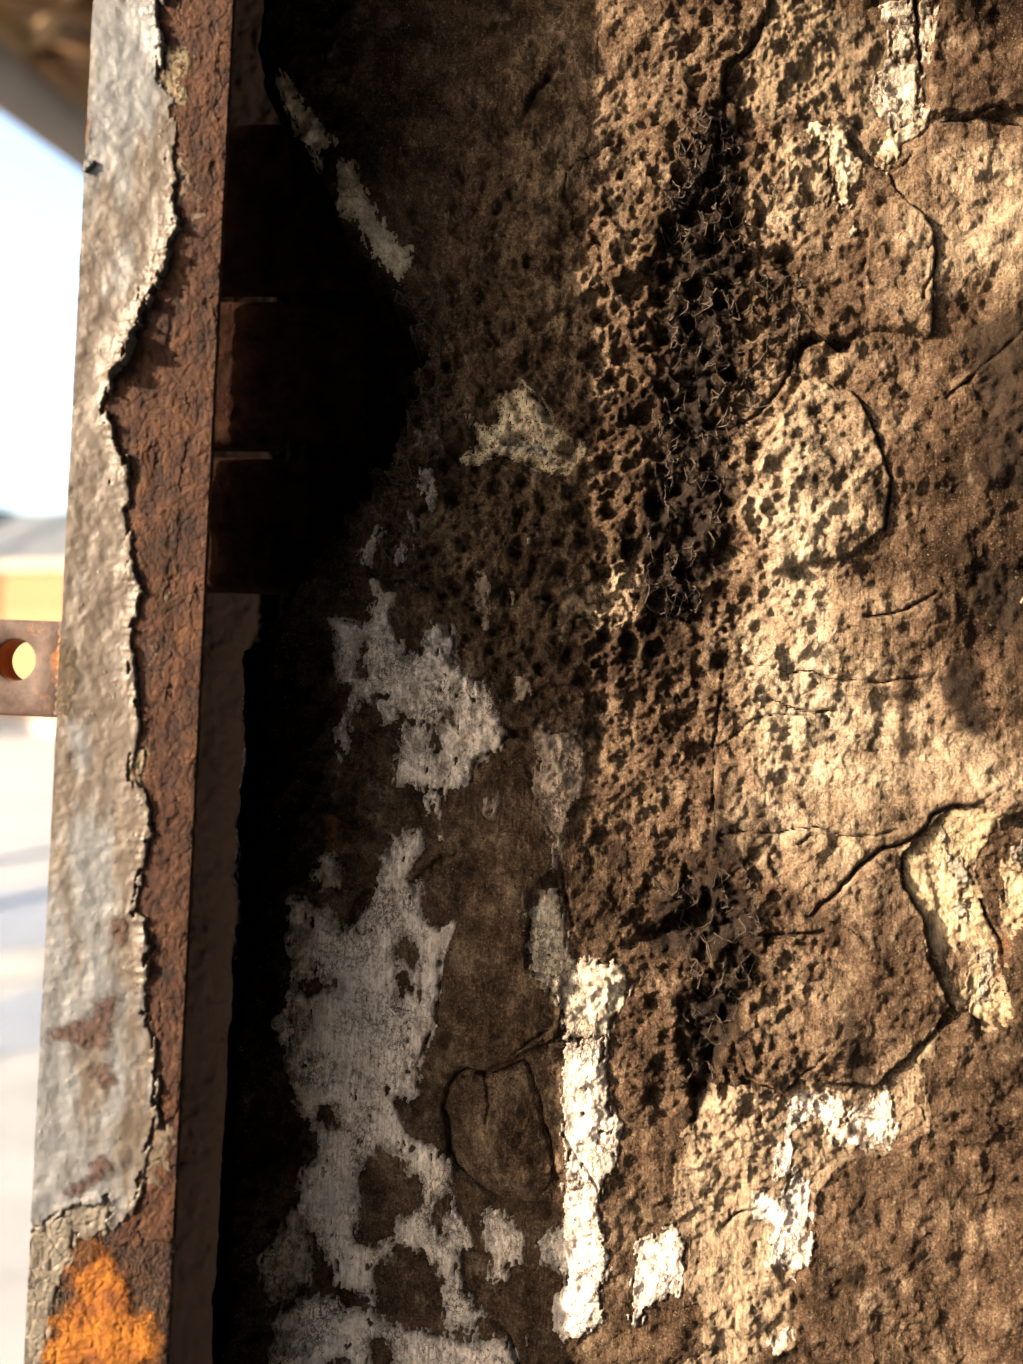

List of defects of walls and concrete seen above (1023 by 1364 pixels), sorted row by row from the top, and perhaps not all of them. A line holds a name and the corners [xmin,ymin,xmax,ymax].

crack [721,18,764,112]
flaking render [734,0,939,238]
spalling [173,67,425,612]
flaking render [459,380,587,477]
crack [741,345,794,424]
crack [855,395,894,521]
crack [869,593,935,617]
corrosion [109,916,129,947]
peeling [256,467,647,1364]
crack [982,903,1000,939]
flaking render [626,1026,939,1364]
corrosion [40,1242,162,1364]